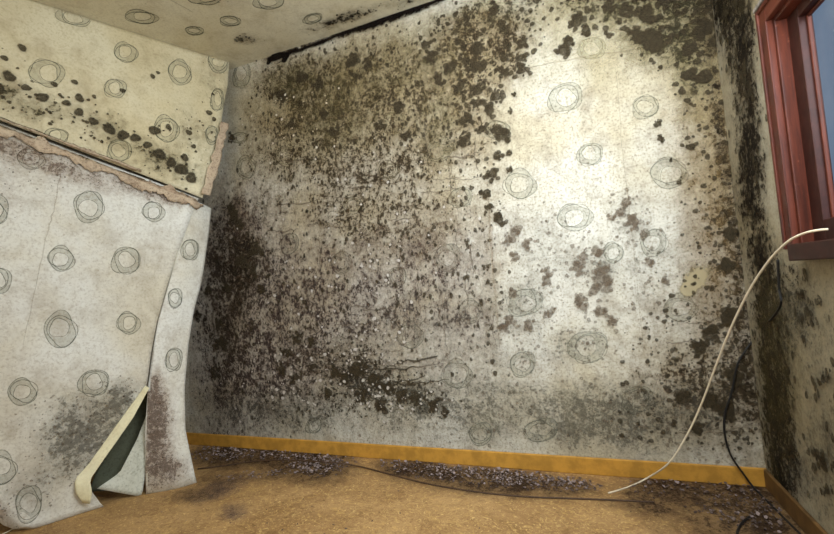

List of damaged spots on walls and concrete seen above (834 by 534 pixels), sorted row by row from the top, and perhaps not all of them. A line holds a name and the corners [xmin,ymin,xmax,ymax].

water stain [0,137,178,205]
water stain [0,44,216,190]
water stain [189,0,834,518]
water stain [42,385,135,480]
water stain [145,375,232,500]